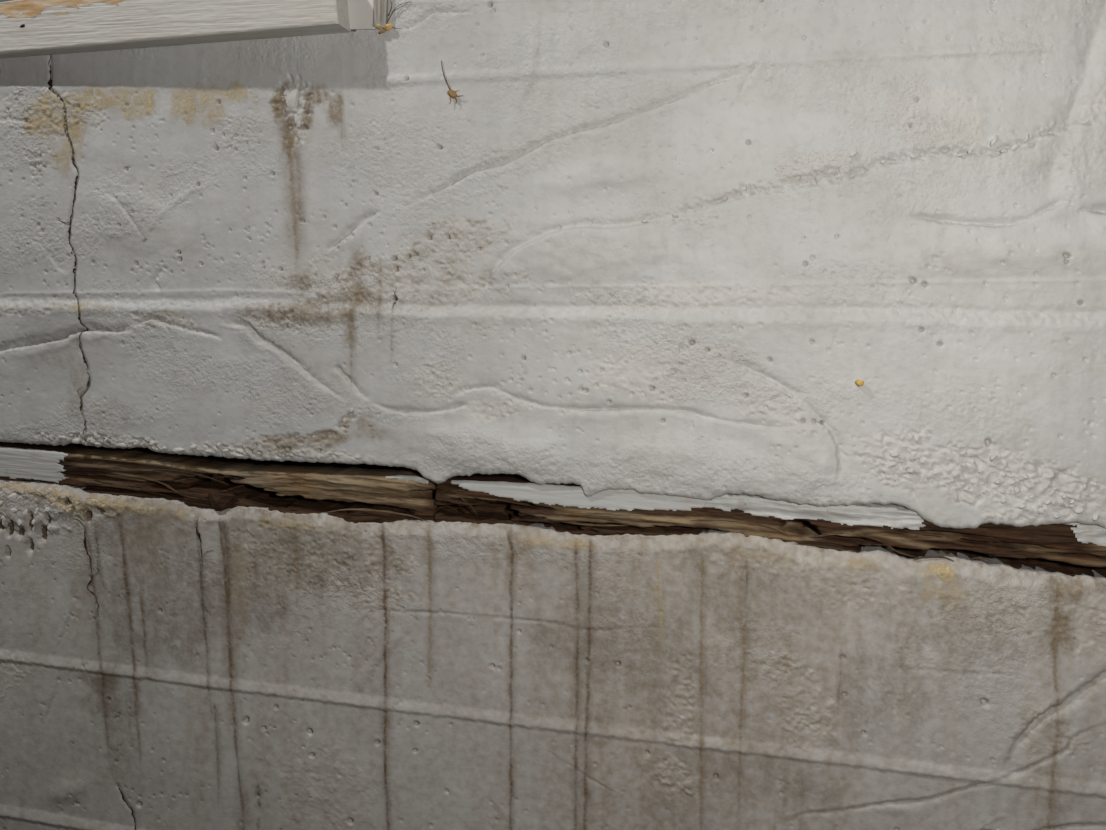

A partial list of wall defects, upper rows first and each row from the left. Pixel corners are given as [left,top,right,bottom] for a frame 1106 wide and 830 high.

crack [47,55,90,442]
spalling [0,481,129,551]
crack [76,519,99,612]
peeling [704,495,926,530]
peeling [1071,525,1106,546]
crack [118,786,136,830]